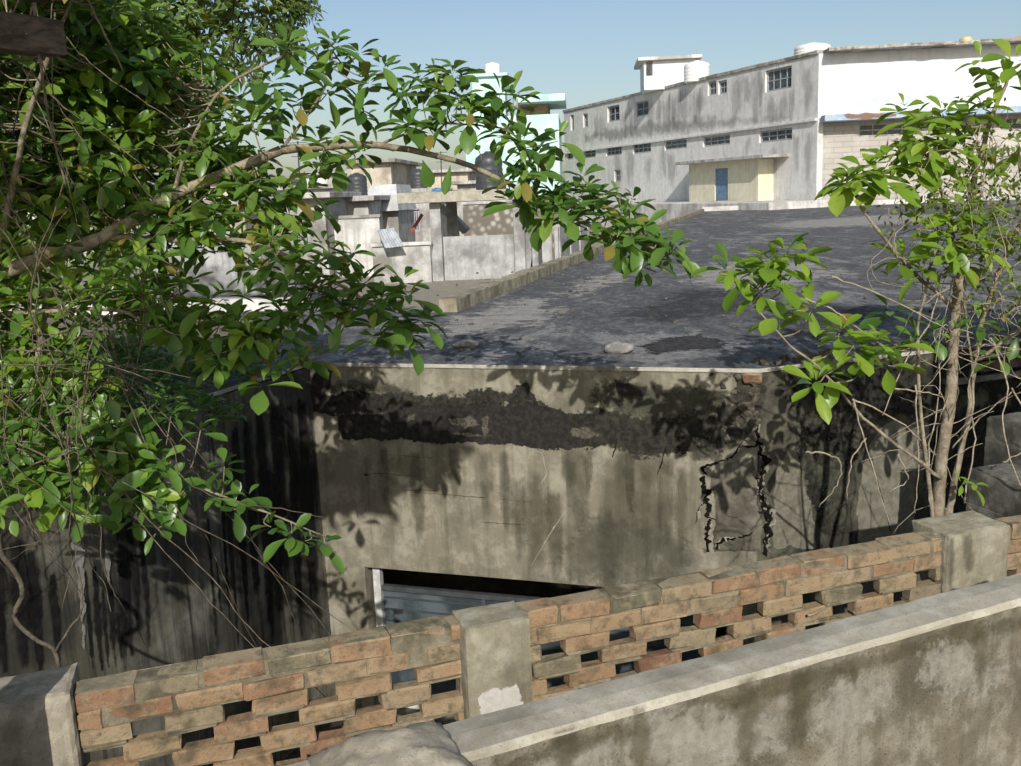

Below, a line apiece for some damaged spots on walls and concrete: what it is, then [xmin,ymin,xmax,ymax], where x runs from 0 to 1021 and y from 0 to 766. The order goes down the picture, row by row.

water stain [322,380,548,409]
peeling [310,369,767,454]
water stain [572,379,731,460]
water stain [0,539,61,673]
water stain [84,487,149,670]
water stain [207,399,318,647]